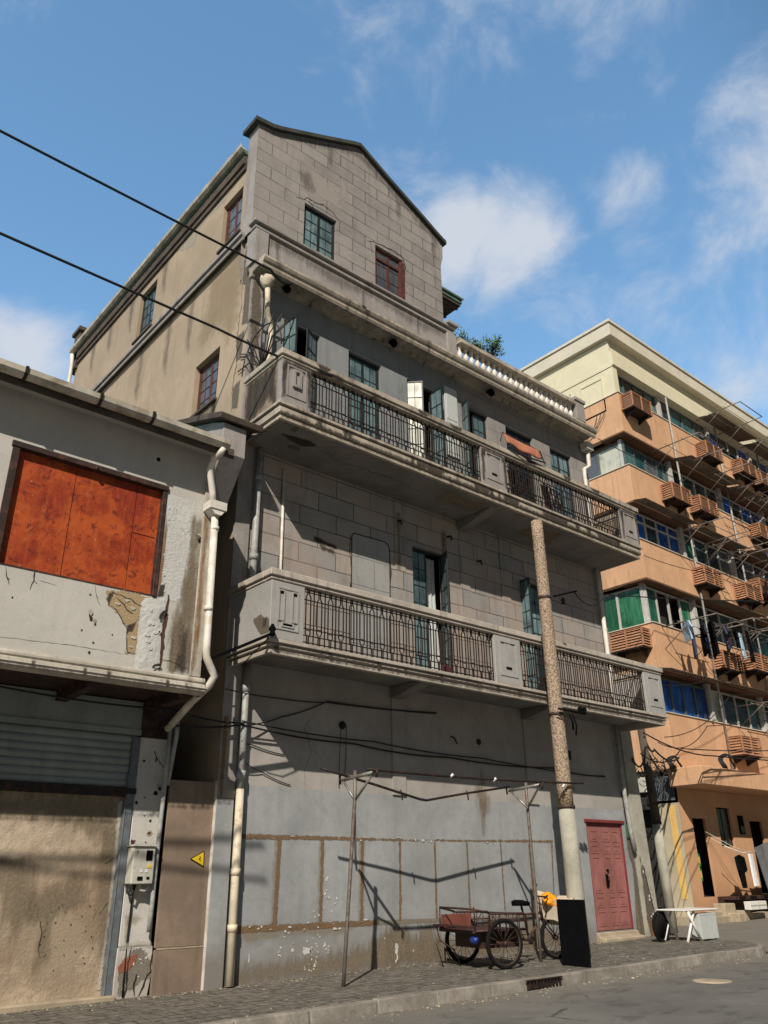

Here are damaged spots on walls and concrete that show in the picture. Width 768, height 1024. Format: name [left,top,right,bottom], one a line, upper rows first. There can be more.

spalling [106,590,148,654]
leakage [166,513,207,686]
spalling [23,784,162,998]
peeling [249,877,341,972]